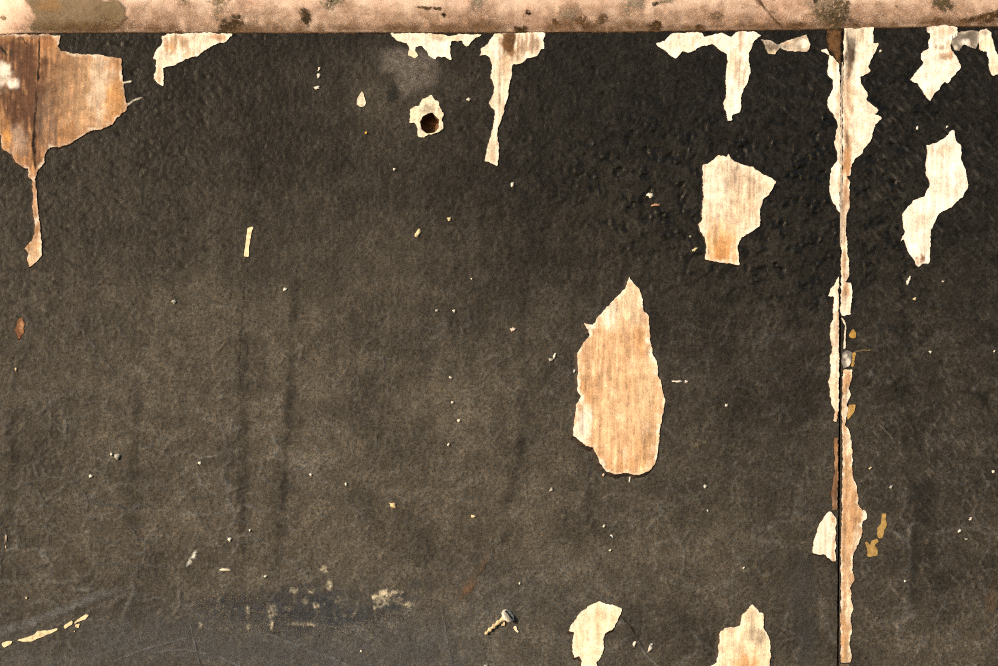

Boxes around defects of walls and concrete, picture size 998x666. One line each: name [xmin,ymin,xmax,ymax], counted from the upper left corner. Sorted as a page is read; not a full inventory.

peeling [0,33,128,269]
peeling [153,32,232,87]
peeling [390,32,545,167]
peeling [900,130,968,268]
peeling [910,25,998,102]
peeling [569,277,665,479]
peeling [656,27,887,666]
peeling [566,601,622,666]